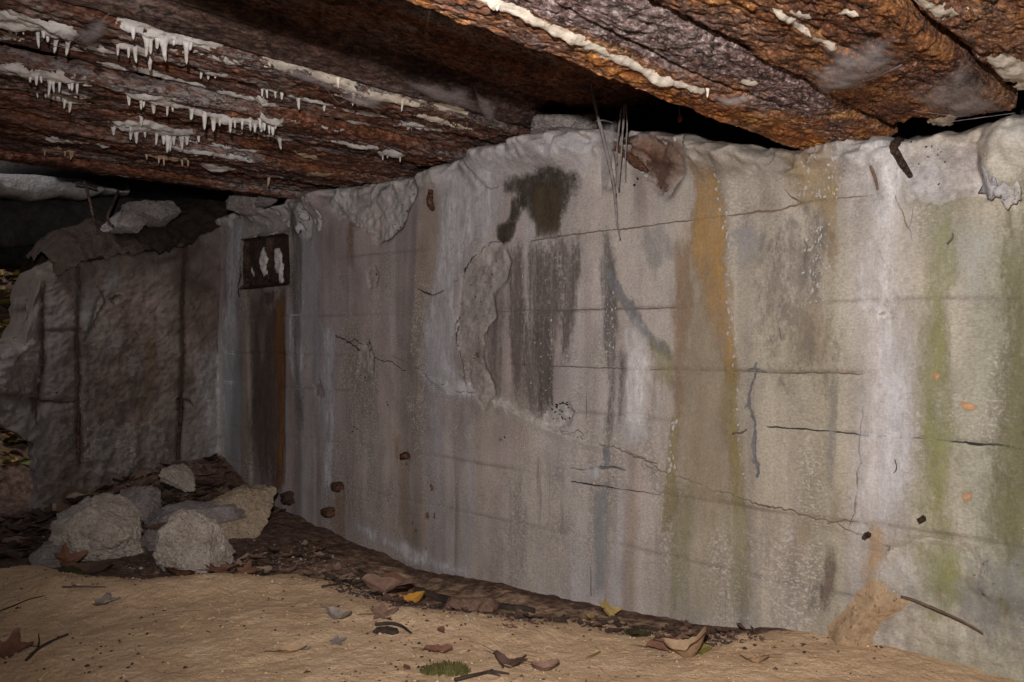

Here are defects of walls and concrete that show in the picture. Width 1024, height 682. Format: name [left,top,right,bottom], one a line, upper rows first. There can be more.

water stain [0,9,475,185]
corrosion [248,291,286,489]
spalling [253,175,418,243]
spalling [455,242,525,408]
water stain [423,135,610,477]
water stain [601,238,672,442]
spalling [623,135,686,196]
crack [331,240,1024,578]
corrosion [665,173,742,516]
crack [532,192,914,241]
water stain [848,140,911,527]